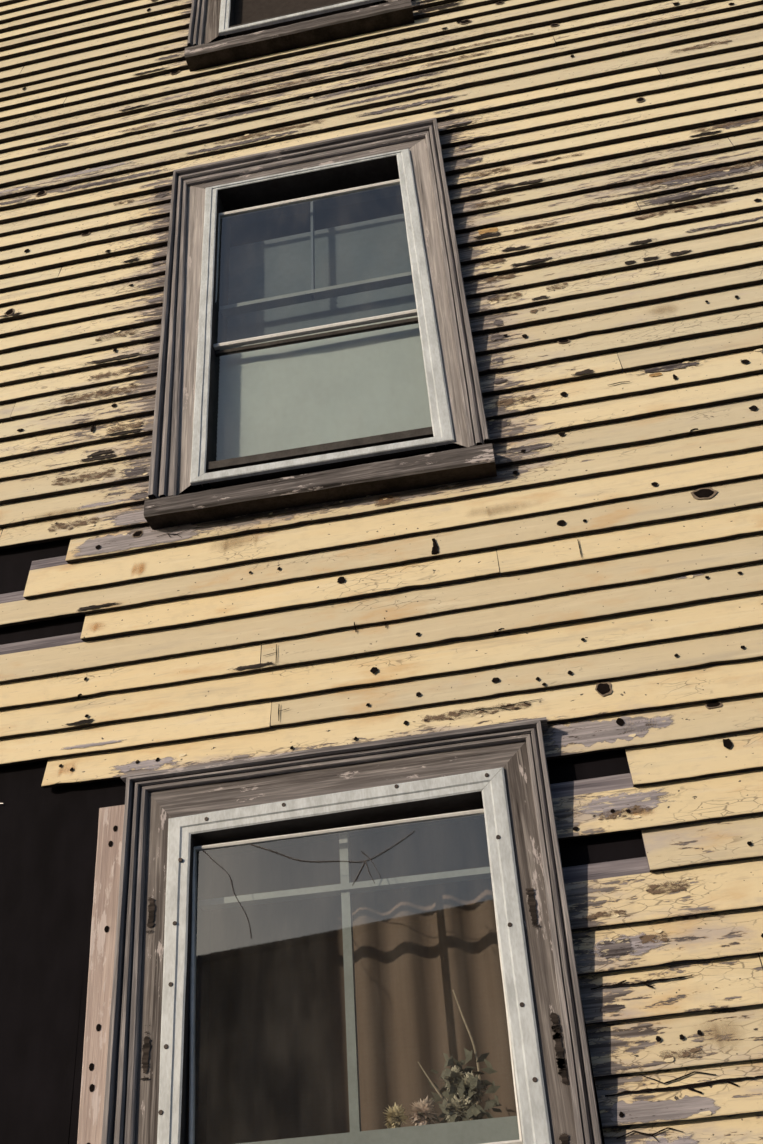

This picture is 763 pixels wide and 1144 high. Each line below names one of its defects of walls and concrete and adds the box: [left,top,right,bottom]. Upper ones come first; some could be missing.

peeling [0,186,28,206]
peeling [632,160,763,220]
peeling [686,216,763,233]
peeling [628,360,708,375]
peeling [60,365,148,404]
peeling [506,443,558,454]
peeling [51,466,150,486]
peeling [47,491,148,532]
peeling [570,787,674,820]
crack [591,975,692,990]
crack [605,1071,763,1097]
crack [616,1127,683,1142]